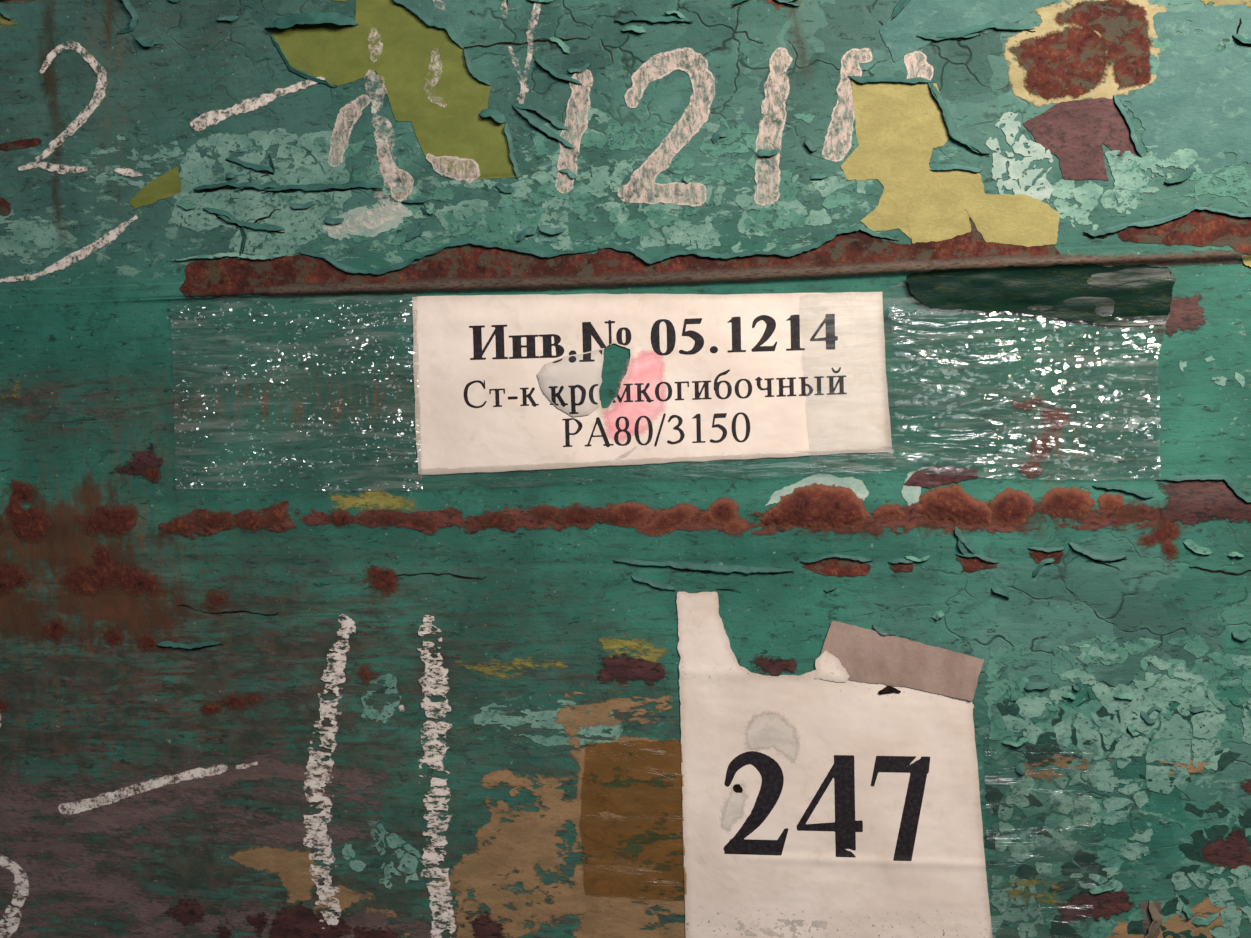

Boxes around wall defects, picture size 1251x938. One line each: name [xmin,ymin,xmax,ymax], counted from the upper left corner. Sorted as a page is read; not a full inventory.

corrosion [1008,0,1152,101]
peeling [75,0,1251,260]
corrosion [175,217,1062,297]
corrosion [1117,205,1251,255]
corrosion [0,562,33,595]
corrosion [0,479,52,543]
corrosion [56,504,160,597]
corrosion [158,397,1251,560]
corrosion [1028,547,1065,564]
peeling [1183,539,1213,555]
peeling [361,673,401,723]
peeling [984,630,1251,938]